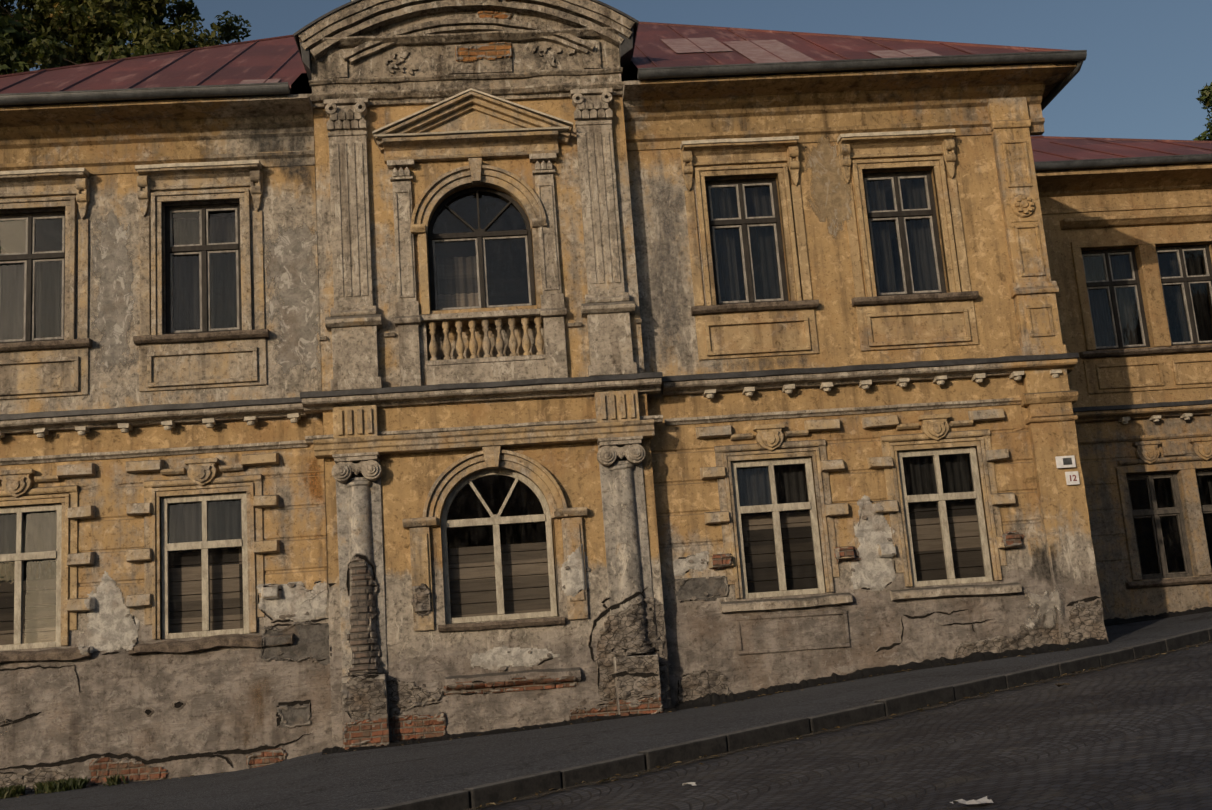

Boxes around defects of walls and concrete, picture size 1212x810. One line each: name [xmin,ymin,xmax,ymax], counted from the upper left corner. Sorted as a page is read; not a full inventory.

peeling [560,544,591,597]
peeling [673,551,733,603]
peeling [834,495,897,591]
peeling [257,580,332,666]
flaking render [340,553,578,750]
crack [587,587,656,661]
spalling [569,597,732,721]
spalling [953,596,1109,659]
crack [0,712,41,727]
spalling [275,699,312,729]
flaking render [0,756,168,794]
crack [0,733,312,770]